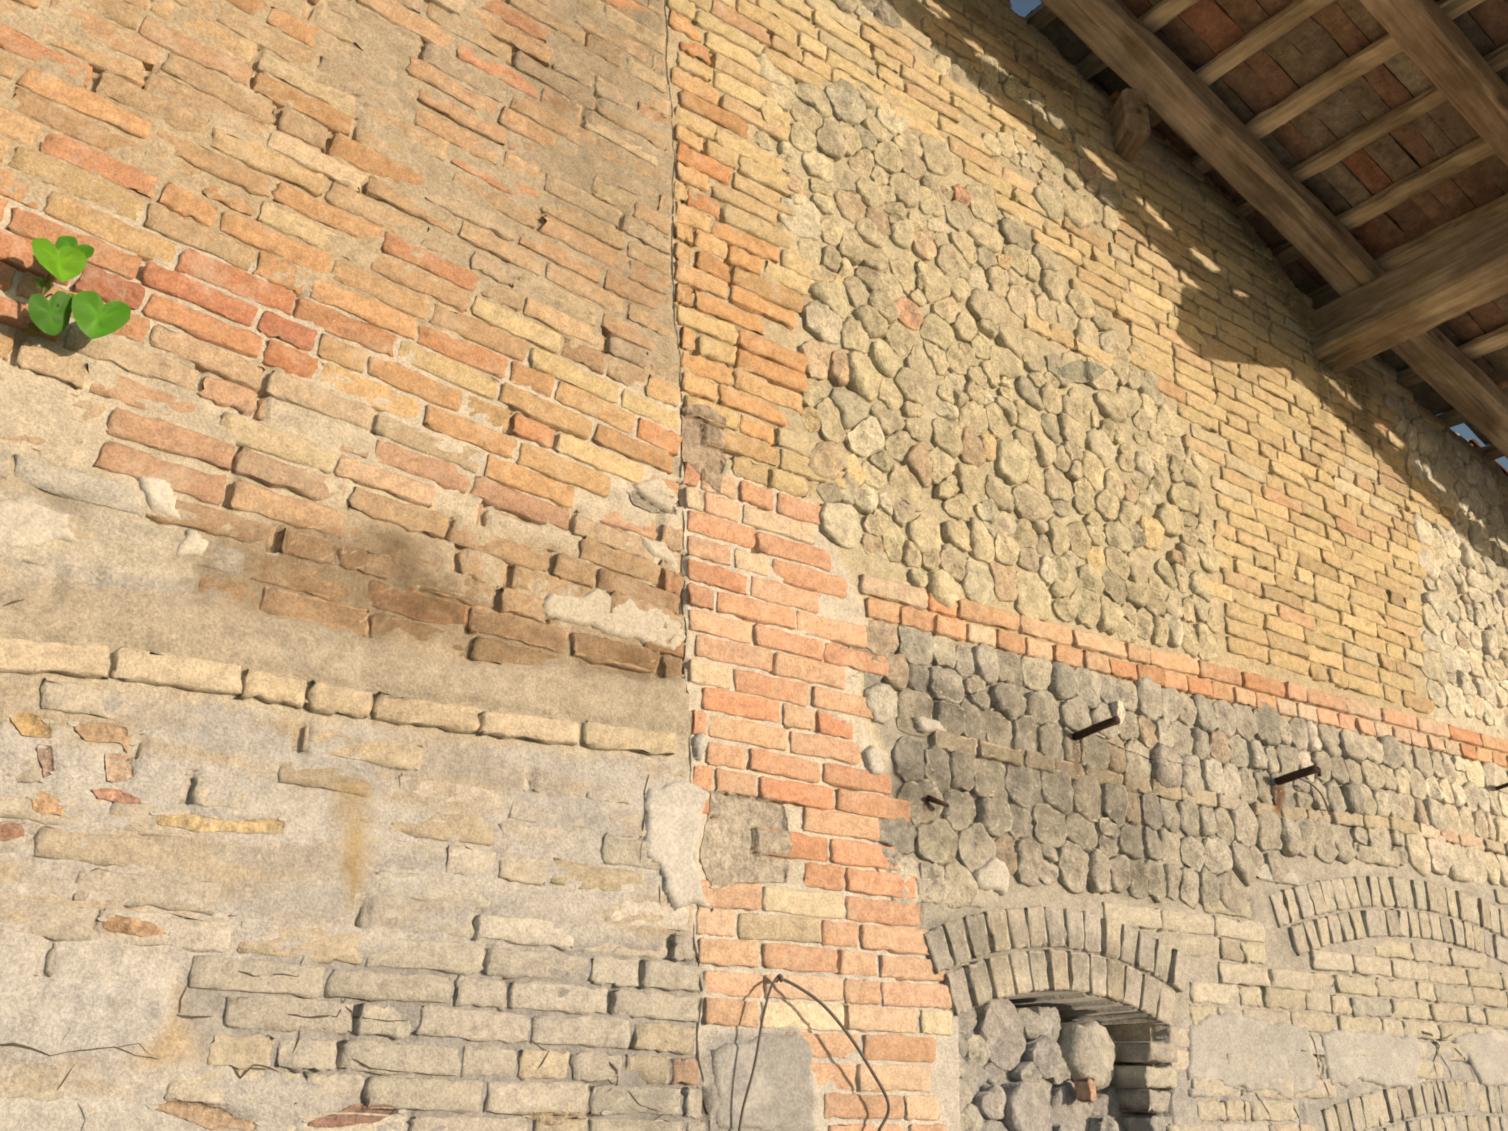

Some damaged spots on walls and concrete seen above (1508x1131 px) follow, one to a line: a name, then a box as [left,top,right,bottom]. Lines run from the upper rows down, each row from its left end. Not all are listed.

crack [648,0,692,780]
flaking render [627,477,679,515]
flaking render [639,536,676,564]
flaking render [543,588,686,651]
spalling [644,780,793,912]
crack [694,938,710,1131]